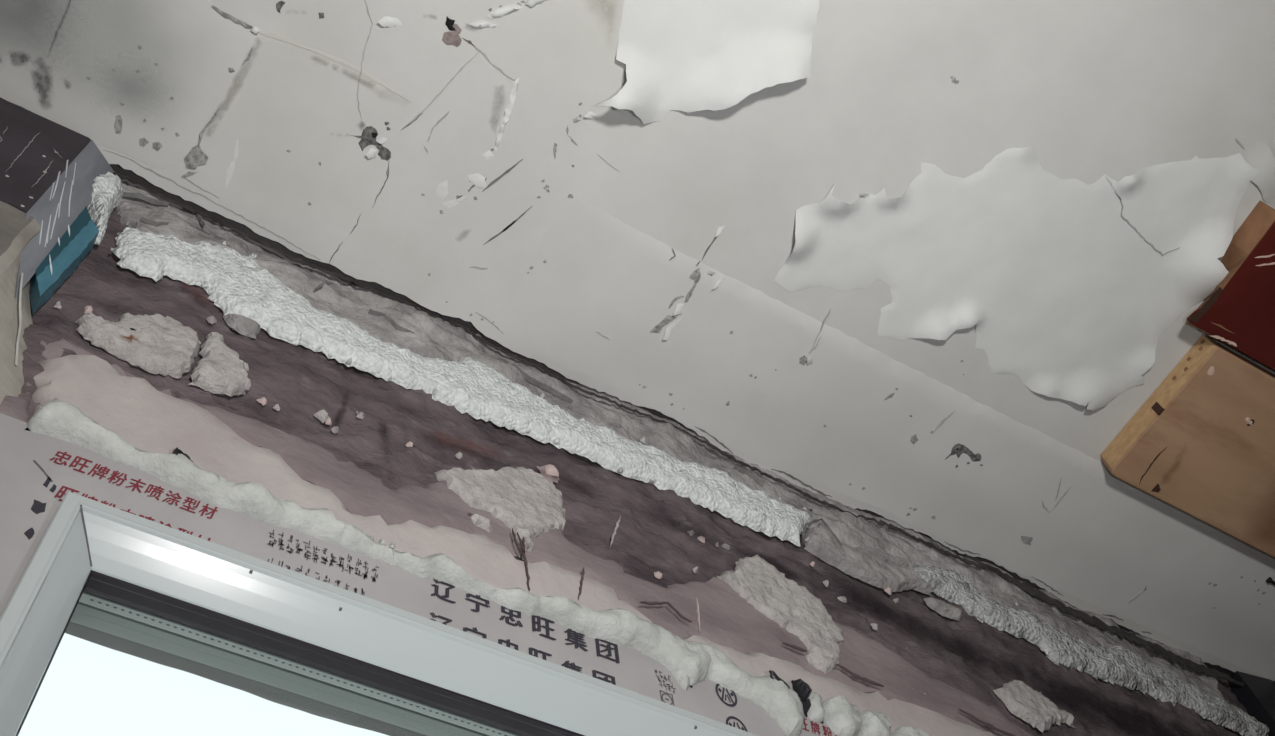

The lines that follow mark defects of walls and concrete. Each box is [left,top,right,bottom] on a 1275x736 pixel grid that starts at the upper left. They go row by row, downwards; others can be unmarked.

crack [357,0,373,126]
crack [402,38,514,153]
peeling [553,0,819,158]
peeling [774,146,1260,410]
crack [105,150,1244,687]